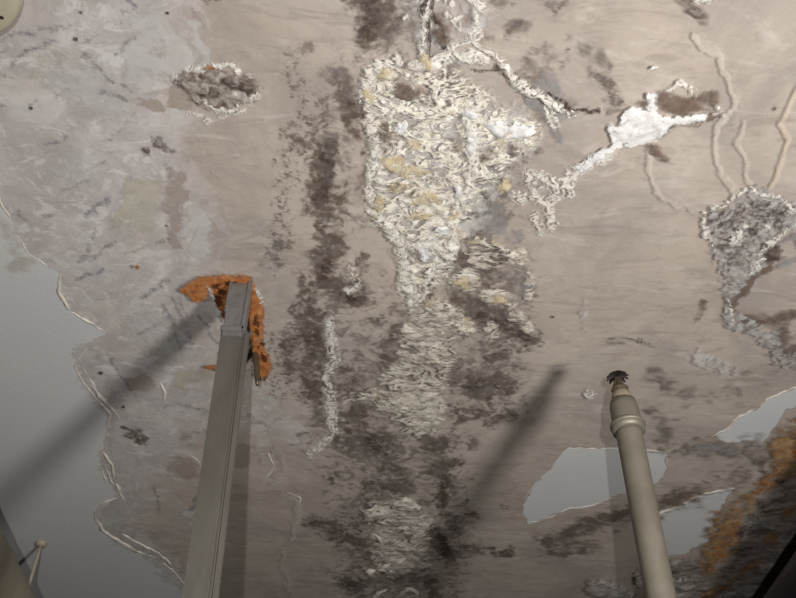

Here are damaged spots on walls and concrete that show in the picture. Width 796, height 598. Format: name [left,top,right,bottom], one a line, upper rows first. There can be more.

crack [420,0,447,61]
leakage [581,48,626,114]
peeling [452,109,487,141]
peeling [470,148,493,191]
peeling [732,204,764,228]
corrosion [180,274,272,382]
leakage [266,0,616,598]
peeling [734,224,796,322]
corrosion [698,419,796,575]